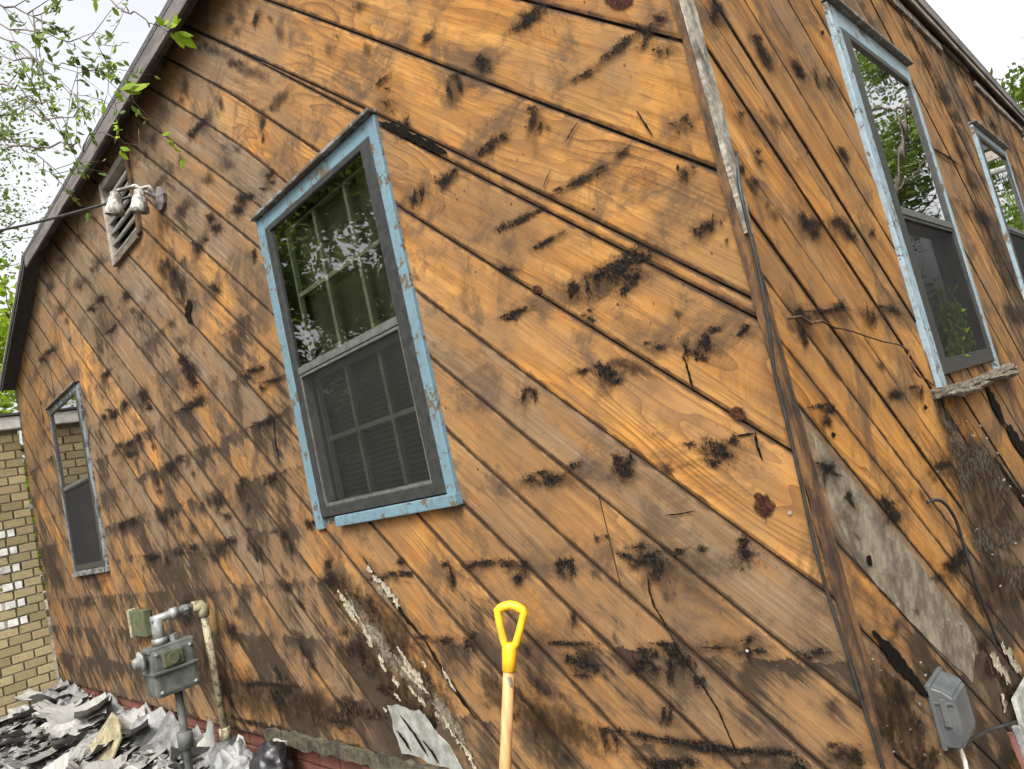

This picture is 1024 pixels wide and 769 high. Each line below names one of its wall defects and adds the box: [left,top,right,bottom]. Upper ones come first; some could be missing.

crack [684,358,693,390]
peeling [367,563,400,609]
leakage [335,578,470,751]
peeling [338,589,477,769]
crack [647,573,747,769]
leakage [943,438,1024,617]
peeling [990,641,1022,713]